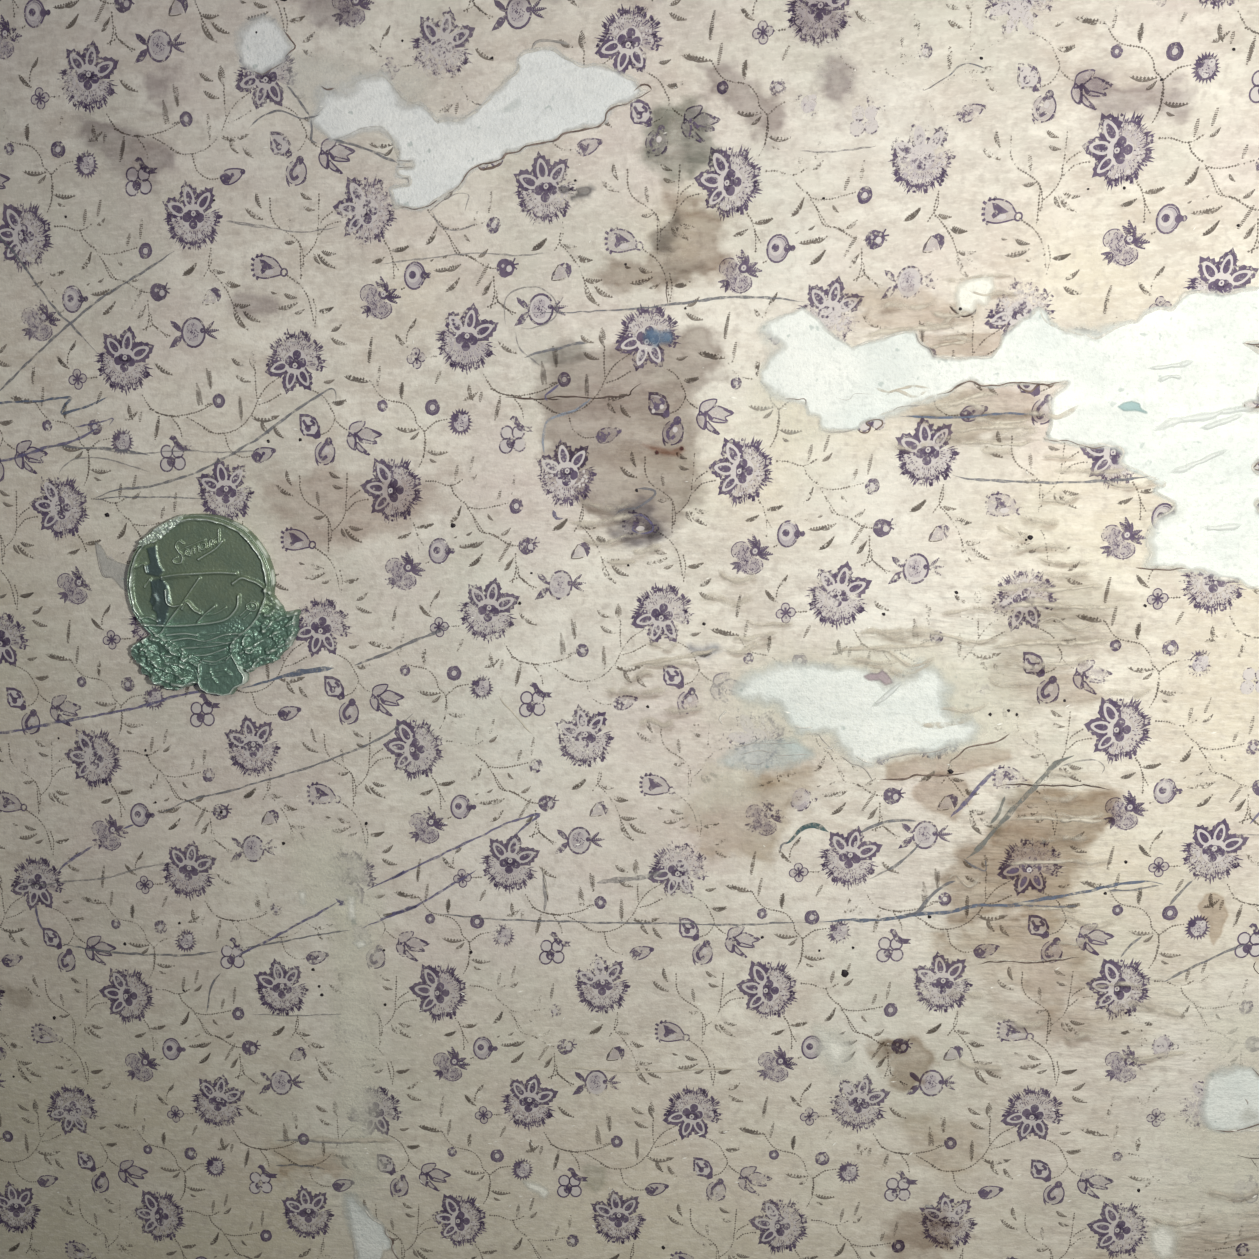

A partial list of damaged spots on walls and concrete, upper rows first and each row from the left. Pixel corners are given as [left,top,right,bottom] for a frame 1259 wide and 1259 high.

peeling [238,16,296,75]
peeling [311,39,652,210]
peeling [761,287,1259,589]
peeling [734,662,1010,781]
peeling [1202,1067,1259,1133]